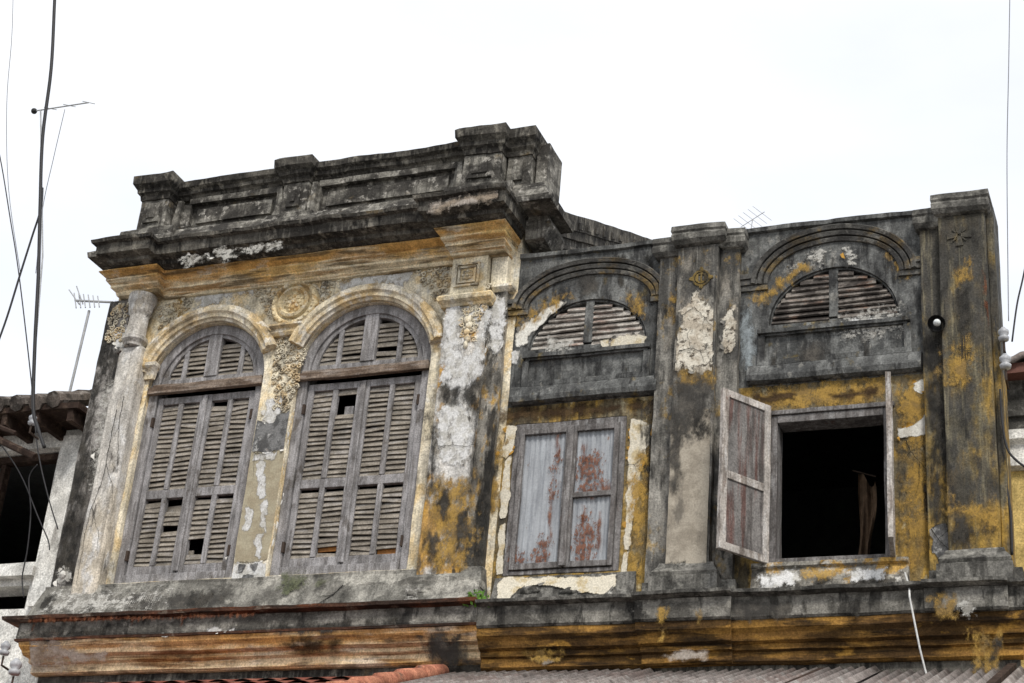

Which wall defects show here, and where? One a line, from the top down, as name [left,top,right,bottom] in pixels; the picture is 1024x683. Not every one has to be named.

peeling [178,241,282,268]
peeling [225,395,295,578]
peeling [432,295,567,467]
corrosion [508,434,563,570]
water stain [420,377,654,575]
peeling [496,418,652,598]
corrosion [570,445,610,561]
spalling [675,290,737,375]
water stain [739,259,999,572]
peeling [897,415,925,441]
water stain [273,619,350,655]